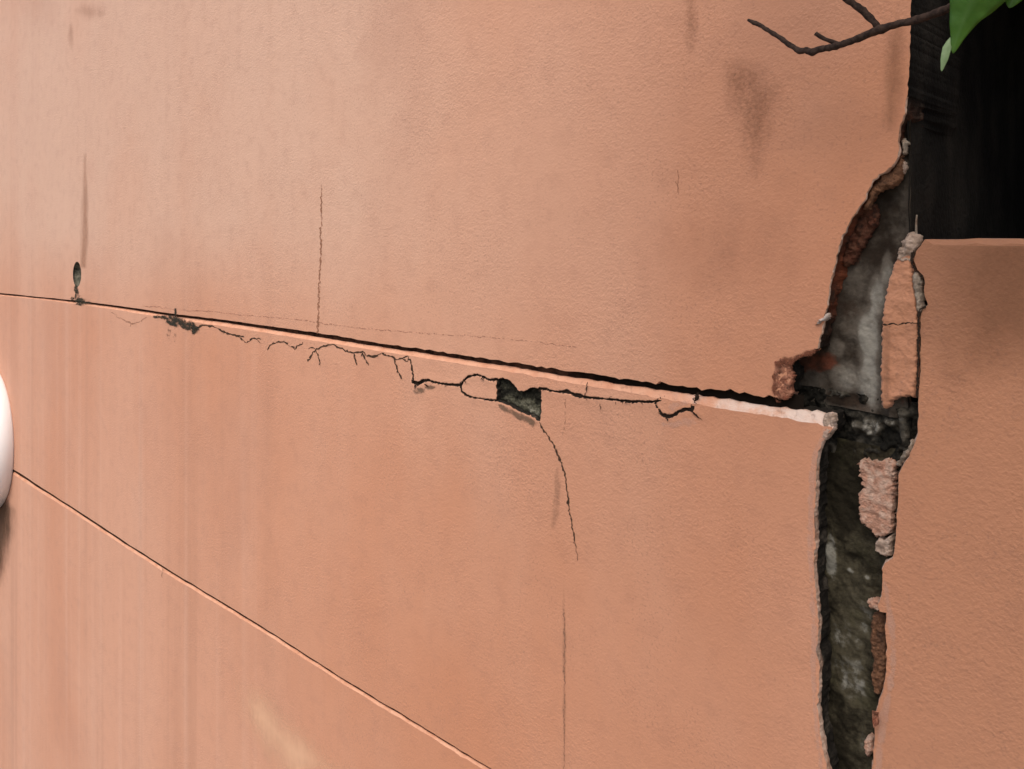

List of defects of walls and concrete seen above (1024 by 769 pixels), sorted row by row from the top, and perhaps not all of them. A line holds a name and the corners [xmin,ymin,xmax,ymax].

crack [0,188,804,560]
spalling [500,379,542,418]
spalling [772,120,923,557]